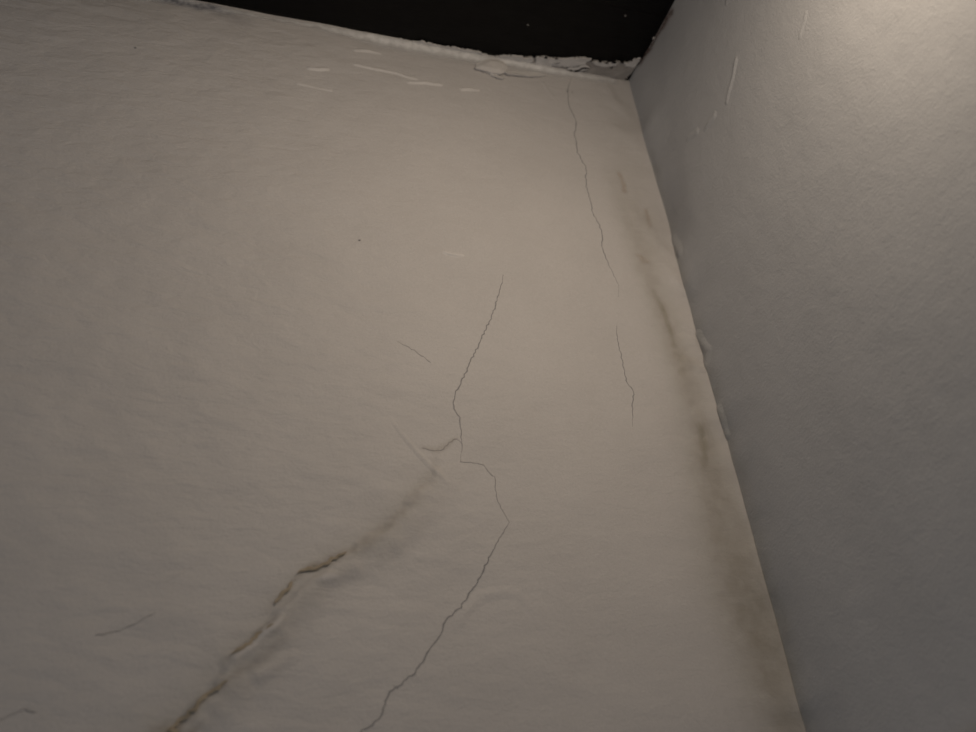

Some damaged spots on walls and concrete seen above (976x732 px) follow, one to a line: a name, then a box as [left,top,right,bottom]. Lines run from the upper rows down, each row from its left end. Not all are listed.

crack [553,62,619,297]
crack [616,325,635,427]
crack [359,275,510,732]